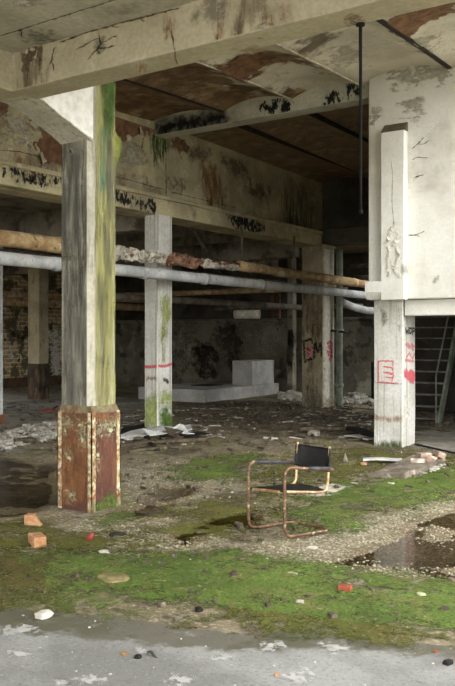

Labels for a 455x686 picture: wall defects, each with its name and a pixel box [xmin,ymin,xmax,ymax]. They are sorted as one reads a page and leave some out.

crack [49,8,179,71]
peeling [387,2,455,54]
peeling [211,53,273,93]
flaking render [30,120,71,165]
leakage [97,111,114,405]
peeling [384,222,403,279]
corrosion [60,412,88,502]